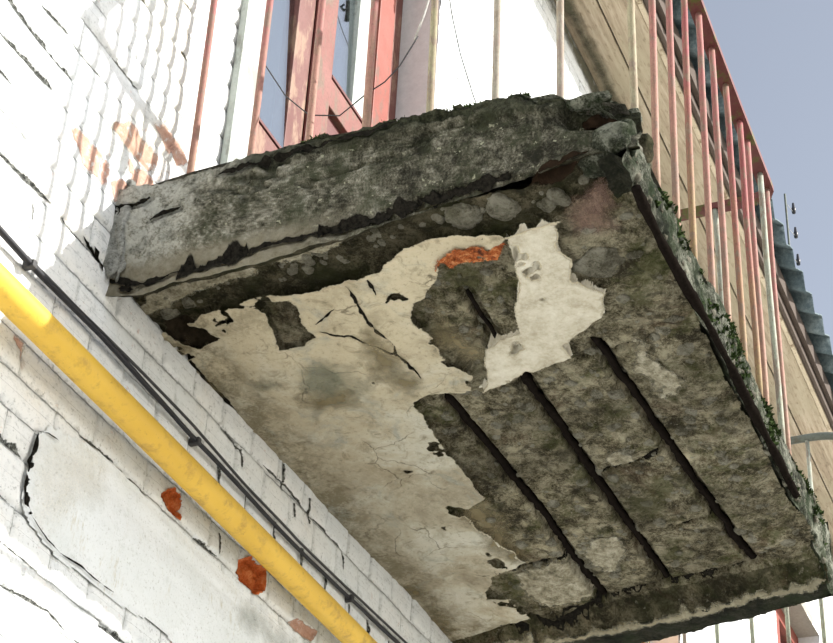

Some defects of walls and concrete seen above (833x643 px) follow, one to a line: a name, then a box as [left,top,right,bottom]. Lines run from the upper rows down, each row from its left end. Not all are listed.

damp [550,0,619,103]
peeling [71,121,159,202]
peeling [155,125,187,165]
rust [435,243,506,272]
crack [315,280,421,378]
spalling [133,151,817,616]
crack [24,431,113,592]
spalling [288,619,317,641]
damp [543,578,826,643]